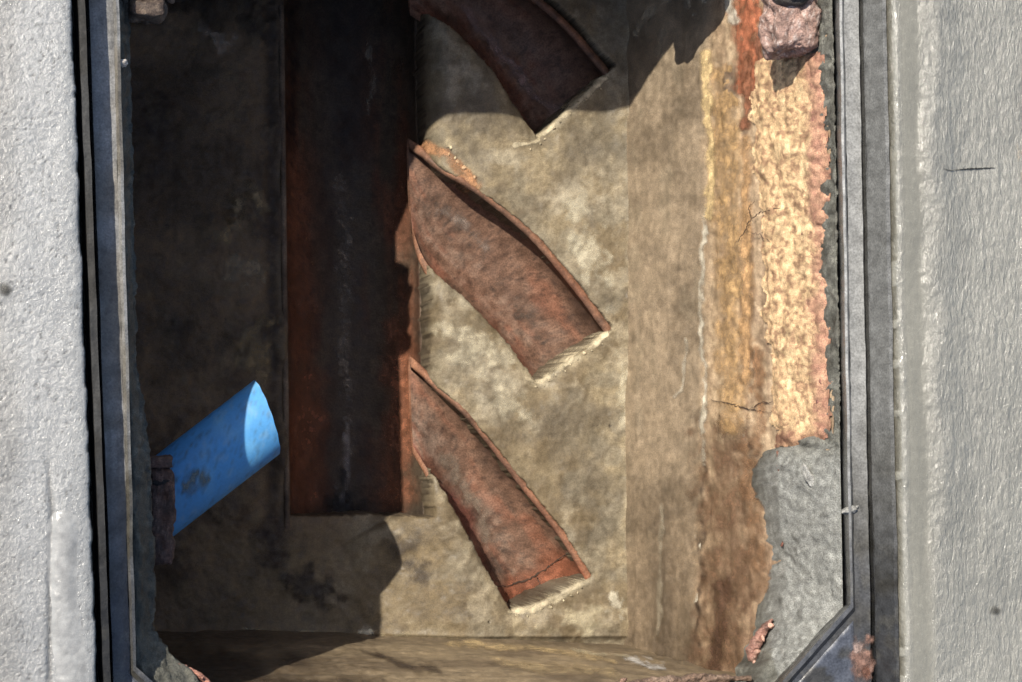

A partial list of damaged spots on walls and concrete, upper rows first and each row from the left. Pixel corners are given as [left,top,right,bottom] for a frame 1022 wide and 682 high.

corrosion [735,0,763,130]
corrosion [383,319,412,466]
corrosion [446,491,471,534]
corrosion [503,567,563,601]
spalling [745,619,774,663]
corrosion [851,635,873,678]